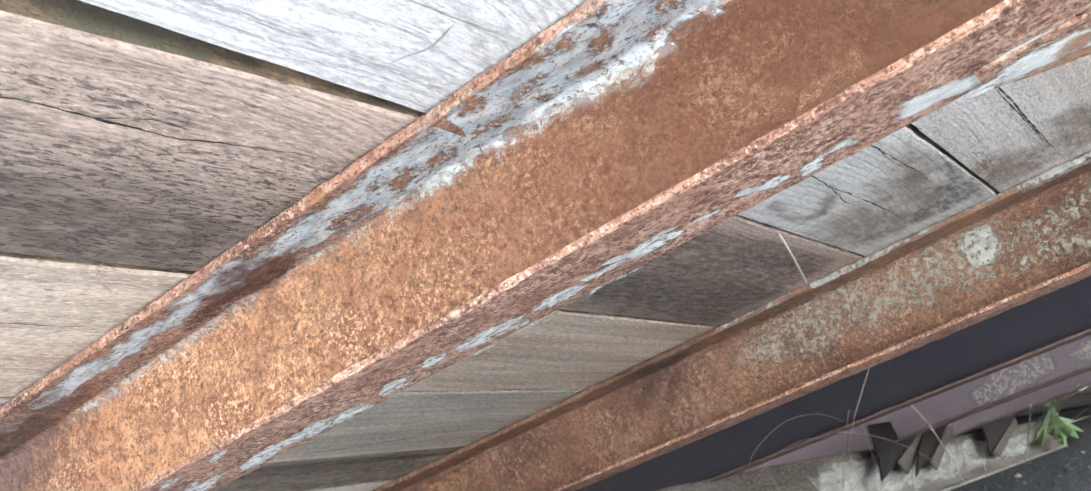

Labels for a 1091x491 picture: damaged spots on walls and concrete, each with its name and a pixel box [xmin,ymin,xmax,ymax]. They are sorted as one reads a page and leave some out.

crack [0,97,321,159]
crack [995,87,1060,155]
peeling [735,138,857,198]
crack [871,145,931,182]
peeling [31,0,720,420]
crack [811,176,906,222]
corrosion [188,258,294,329]
peeling [239,225,683,475]
corrosion [867,421,954,481]
corrosion [981,417,1018,457]
peeling [160,472,226,491]